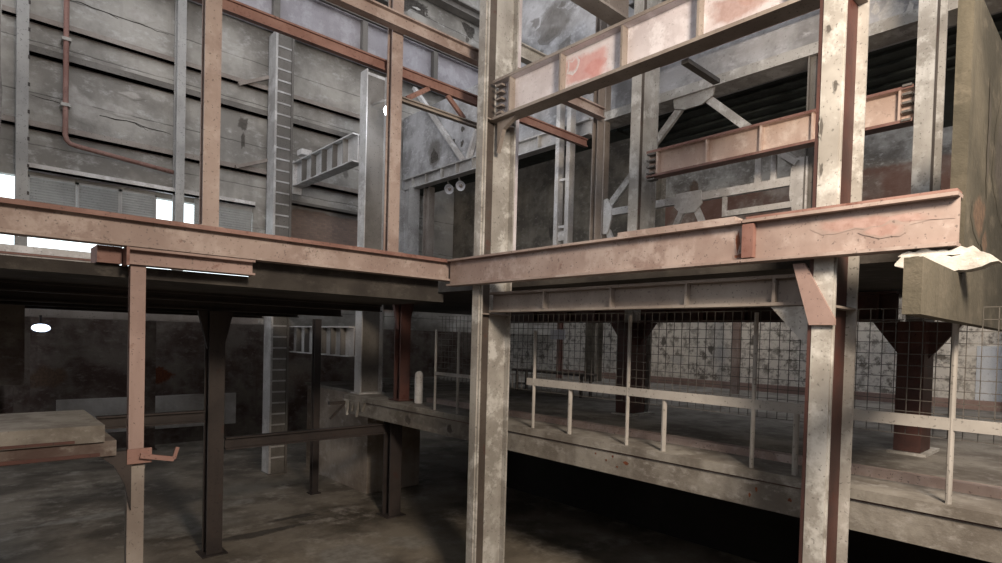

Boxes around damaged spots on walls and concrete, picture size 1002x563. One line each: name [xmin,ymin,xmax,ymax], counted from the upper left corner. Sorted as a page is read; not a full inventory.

crack [71,0,168,35]
corrosion [704,0,779,33]
crack [100,115,169,134]